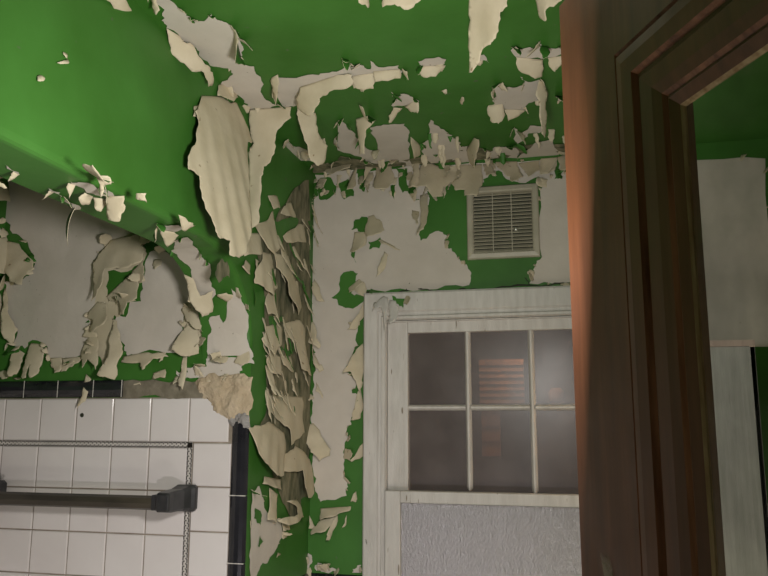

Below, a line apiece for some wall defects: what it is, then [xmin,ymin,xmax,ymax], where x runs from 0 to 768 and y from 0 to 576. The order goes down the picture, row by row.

peeling [0,0,570,576]
peeling [697,154,768,347]